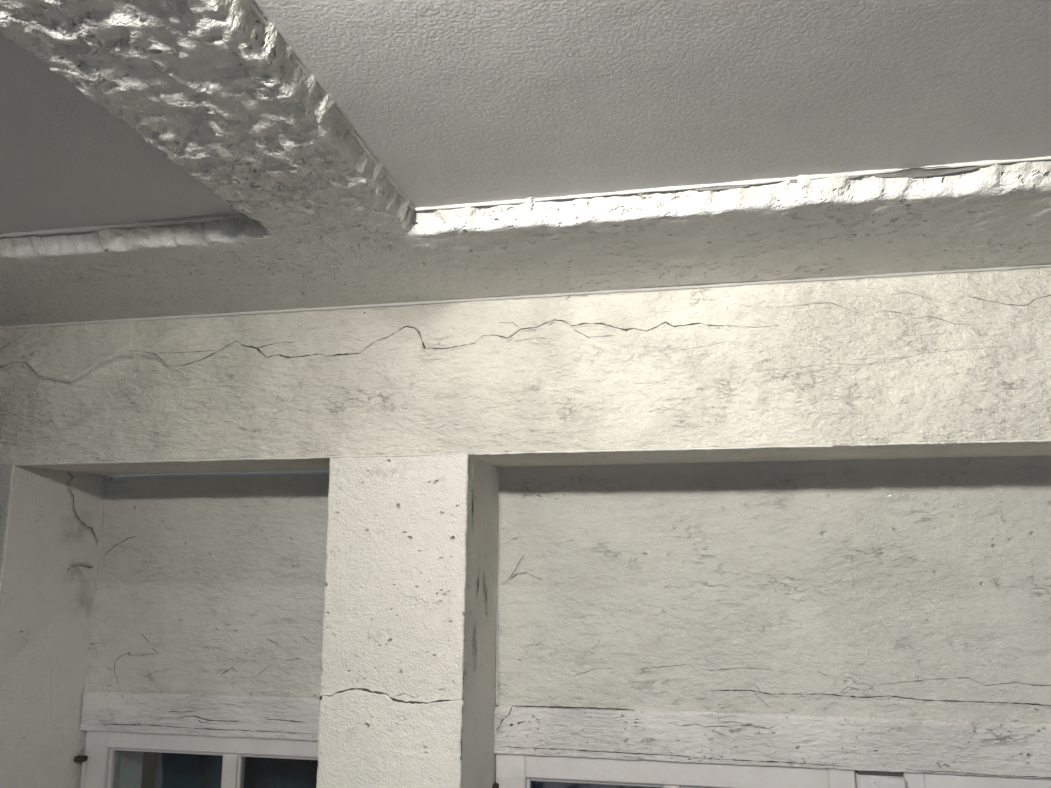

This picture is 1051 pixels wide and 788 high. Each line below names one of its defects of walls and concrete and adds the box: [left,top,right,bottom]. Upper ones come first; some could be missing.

crack [965,295,1051,306]
crack [158,292,1004,378]
crack [66,471,138,572]
crack [109,704,310,734]
crack [319,688,463,707]
crack [495,705,850,767]
crack [643,664,1051,729]